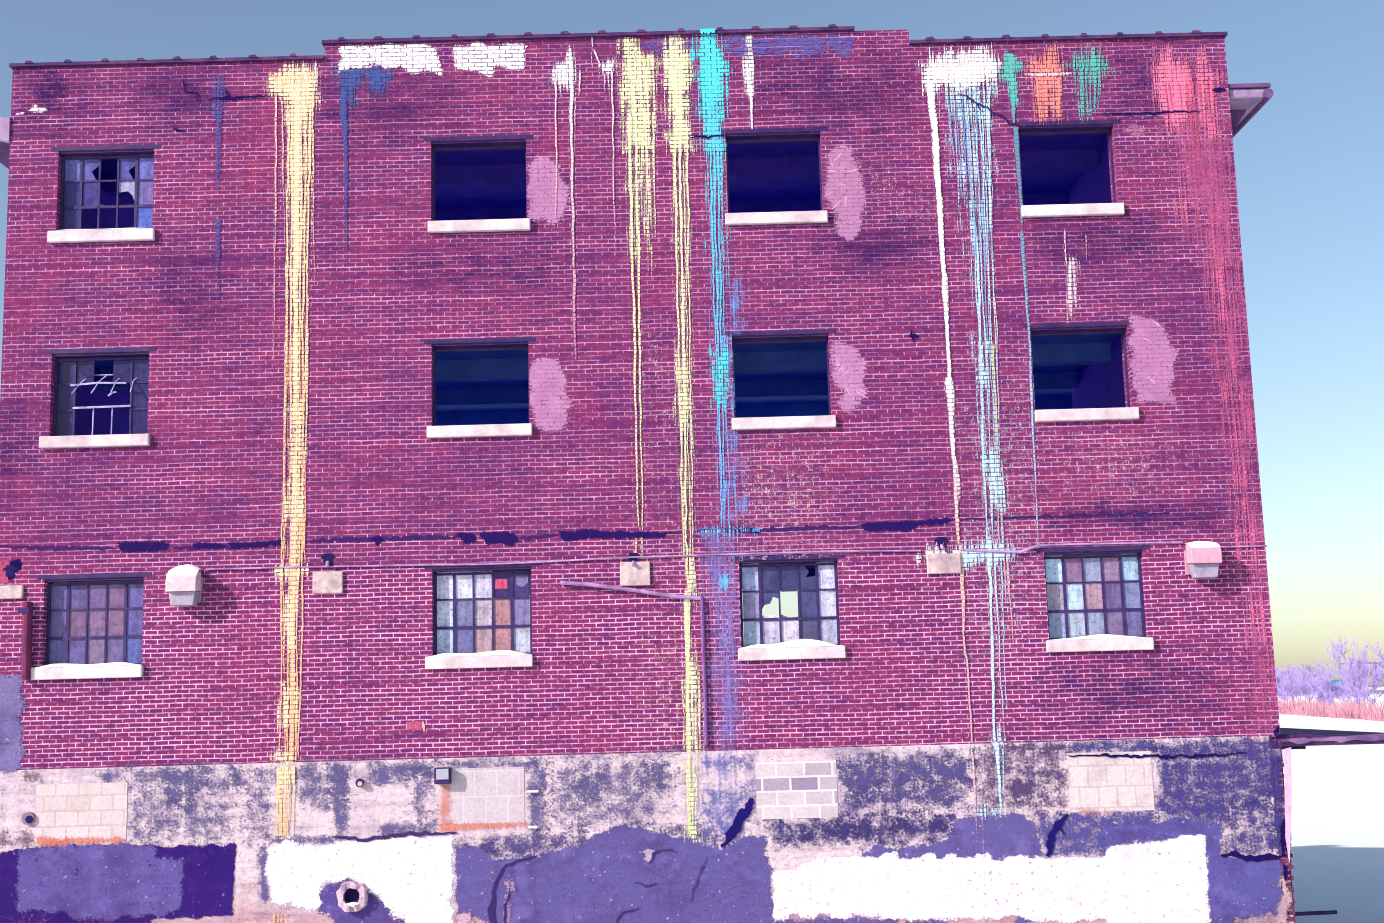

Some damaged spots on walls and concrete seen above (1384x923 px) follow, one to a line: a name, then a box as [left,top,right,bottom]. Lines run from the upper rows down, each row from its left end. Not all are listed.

damp [100,60,1286,901]
crack [1068,752,1247,761]
crack [487,856,536,923]
crack [616,798,754,923]
crack [1046,814,1068,857]
crack [1221,850,1283,862]